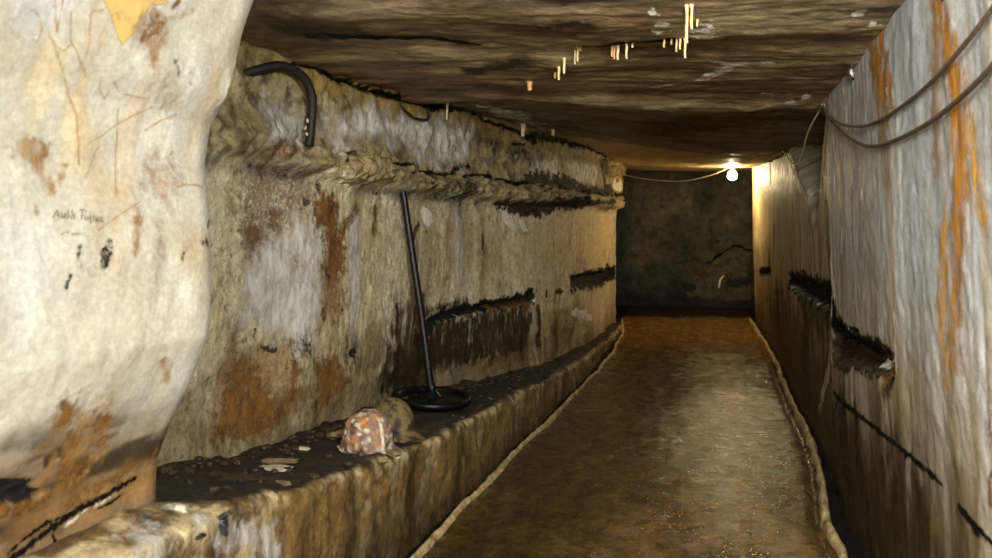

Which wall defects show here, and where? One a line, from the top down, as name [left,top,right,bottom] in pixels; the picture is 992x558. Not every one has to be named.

rust [869,30,893,187]
rust [930,0,985,370]
spalling [424,263,616,336]
spalling [788,269,896,402]
crack [831,378,992,545]